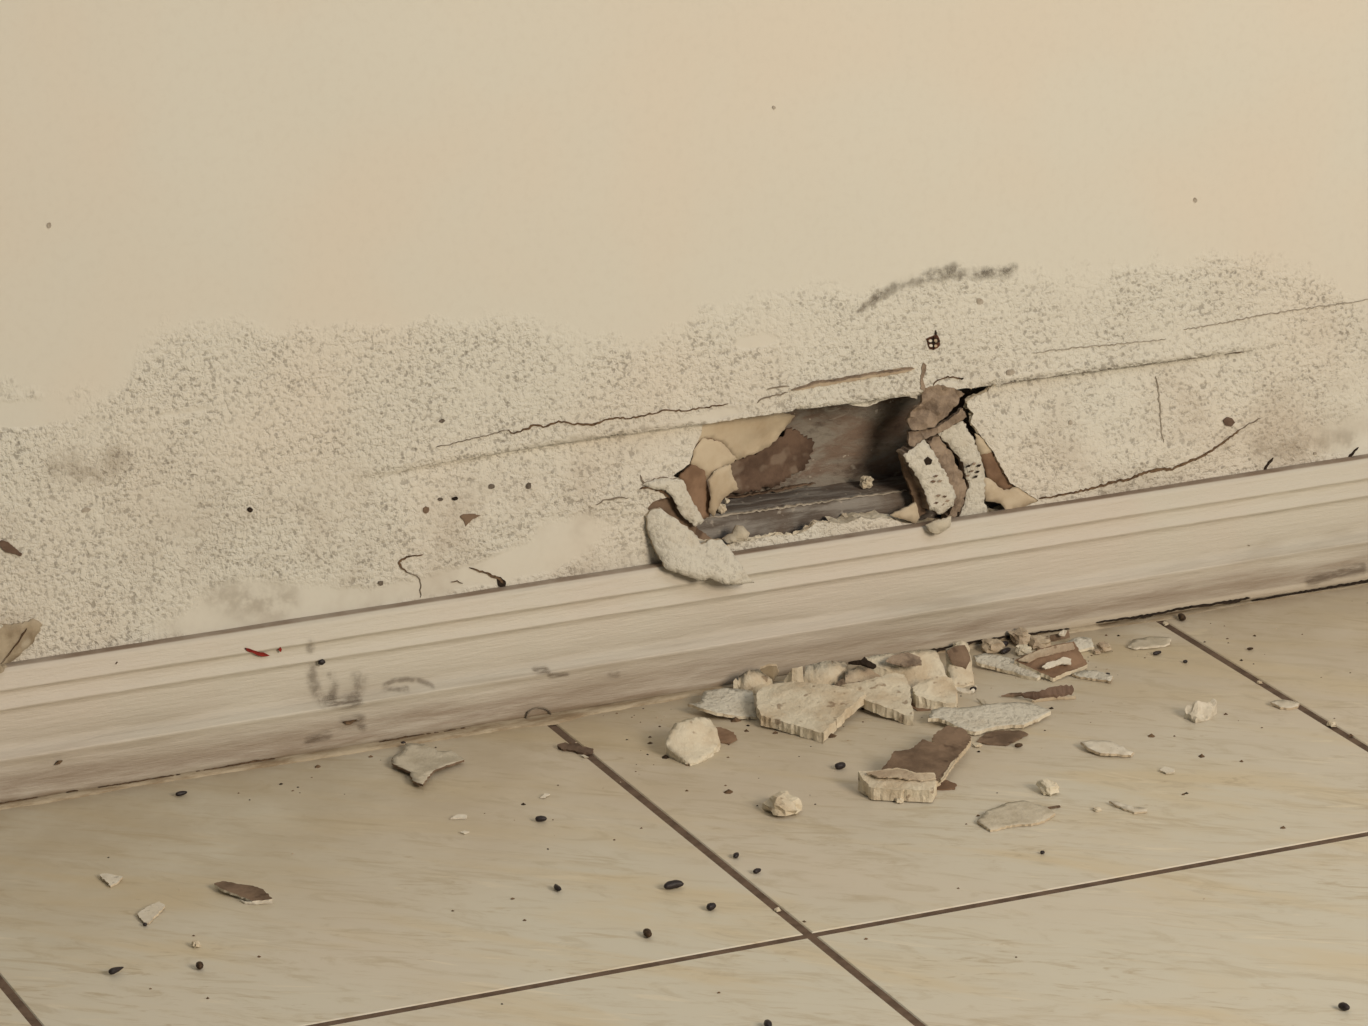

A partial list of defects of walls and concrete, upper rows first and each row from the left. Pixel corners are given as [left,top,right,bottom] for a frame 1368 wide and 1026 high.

crack [437,392,788,447]
spalling [642,367,1038,585]
crack [1003,299,1368,499]